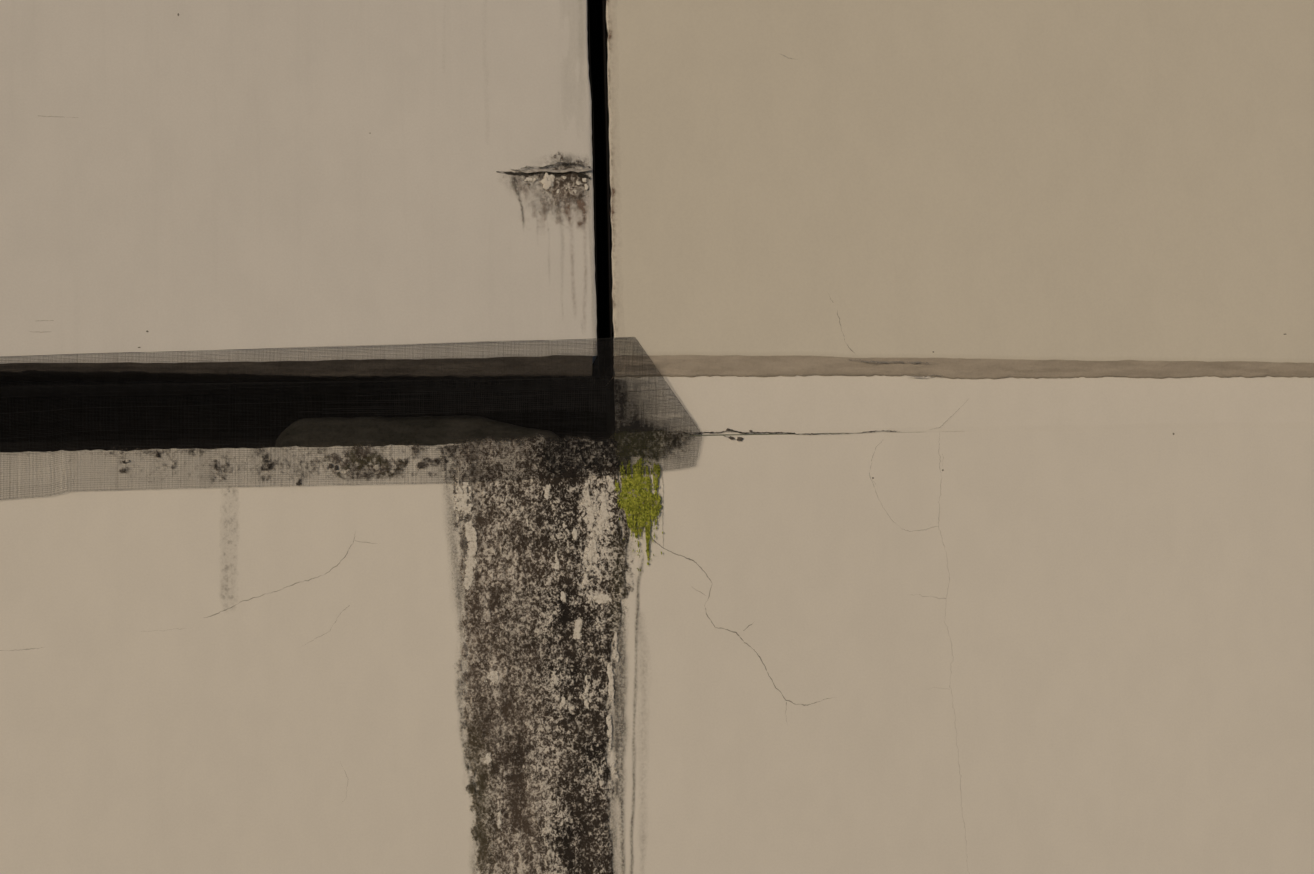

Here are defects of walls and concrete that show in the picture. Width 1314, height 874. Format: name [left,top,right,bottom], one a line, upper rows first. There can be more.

spalling [496,152,592,226]
water stain [450,435,642,874]
crack [653,539,828,714]